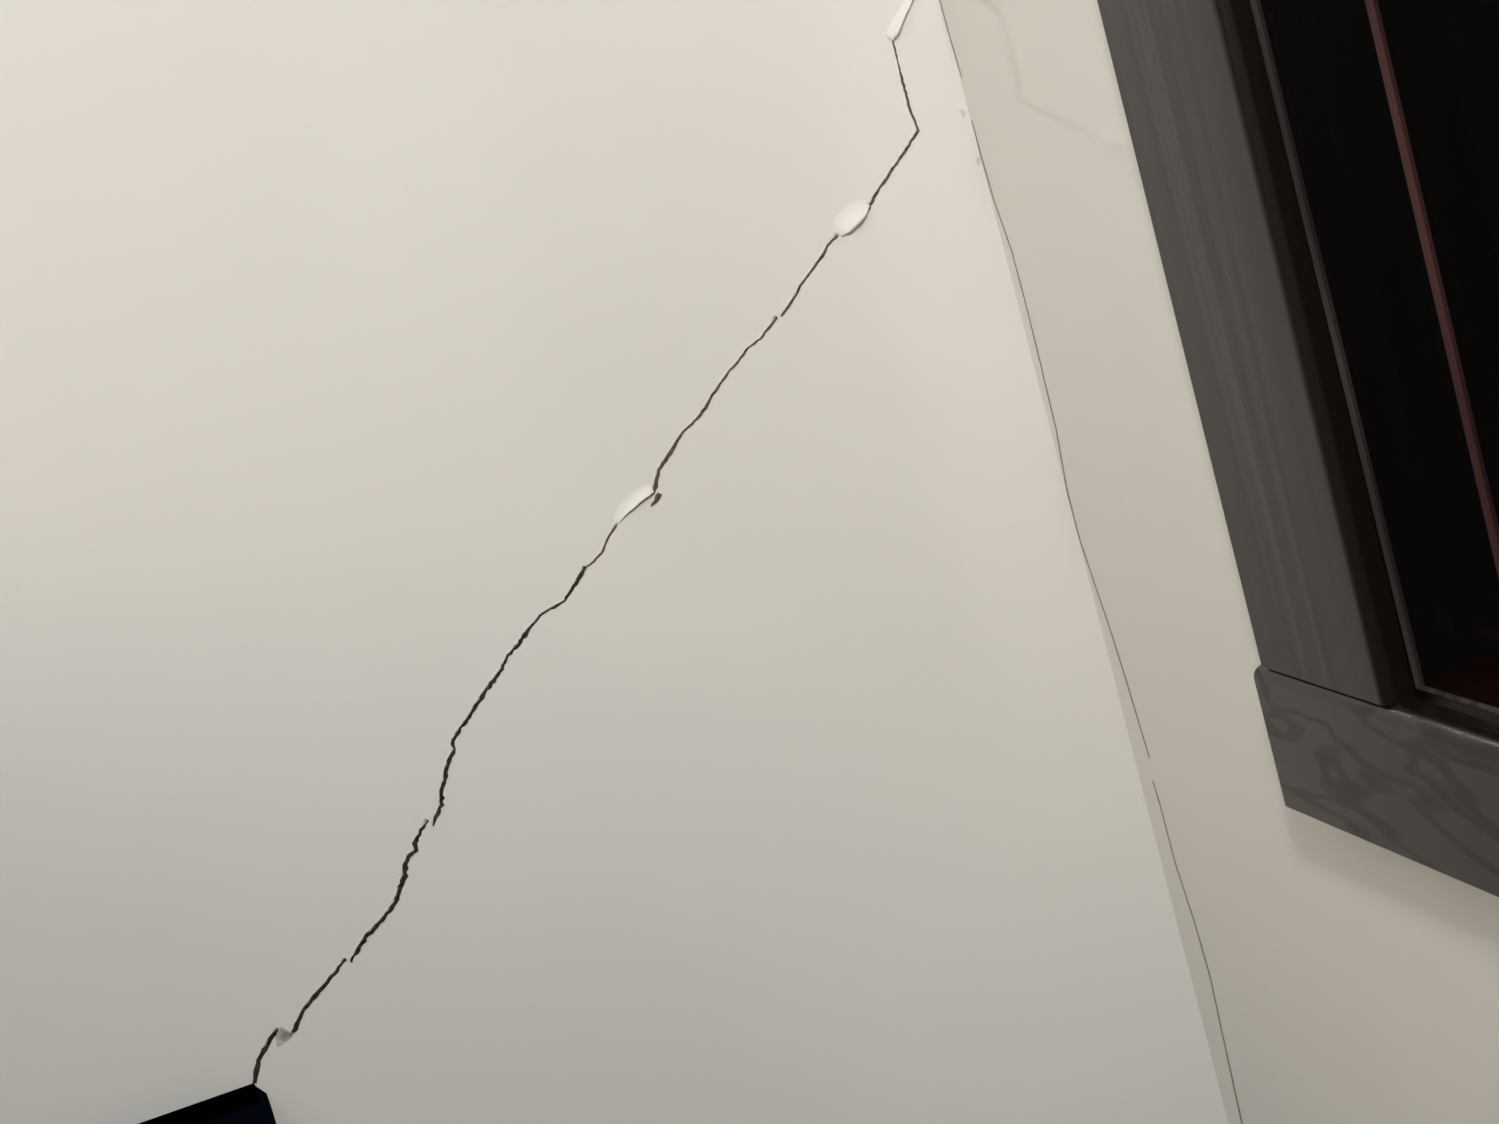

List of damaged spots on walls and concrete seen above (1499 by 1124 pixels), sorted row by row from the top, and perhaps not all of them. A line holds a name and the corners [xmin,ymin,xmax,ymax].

peeling [885,0,913,41]
peeling [834,200,870,237]
peeling [613,483,654,528]
crack [252,0,962,1083]
crack [971,121,1243,1124]